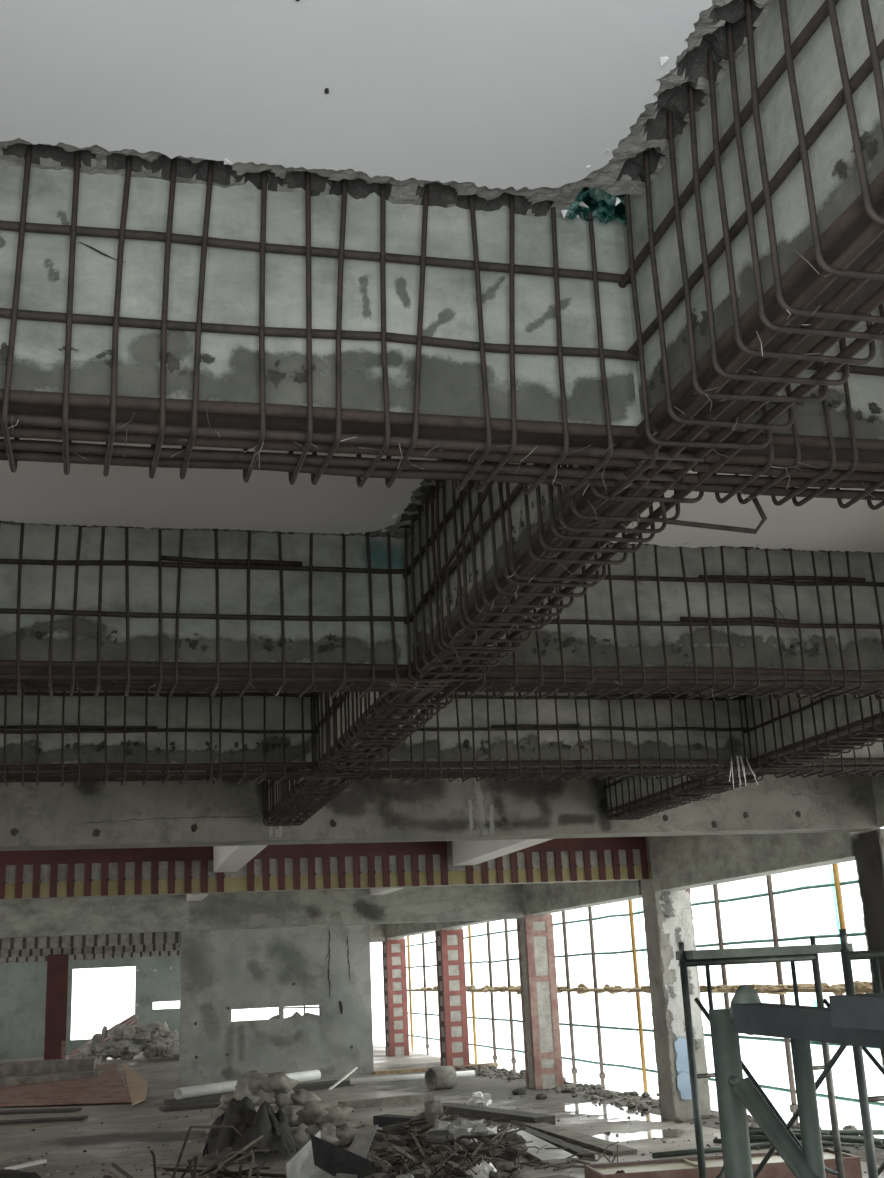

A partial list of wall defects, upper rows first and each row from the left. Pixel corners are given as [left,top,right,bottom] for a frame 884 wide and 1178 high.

peeling [0,122,884,425]
peeling [735,389,884,440]
flaking render [0,479,447,539]
flaking render [609,542,884,554]
peeling [0,616,401,664]
peeling [470,627,884,669]
peeling [0,736,314,764]
peeling [364,735,742,761]